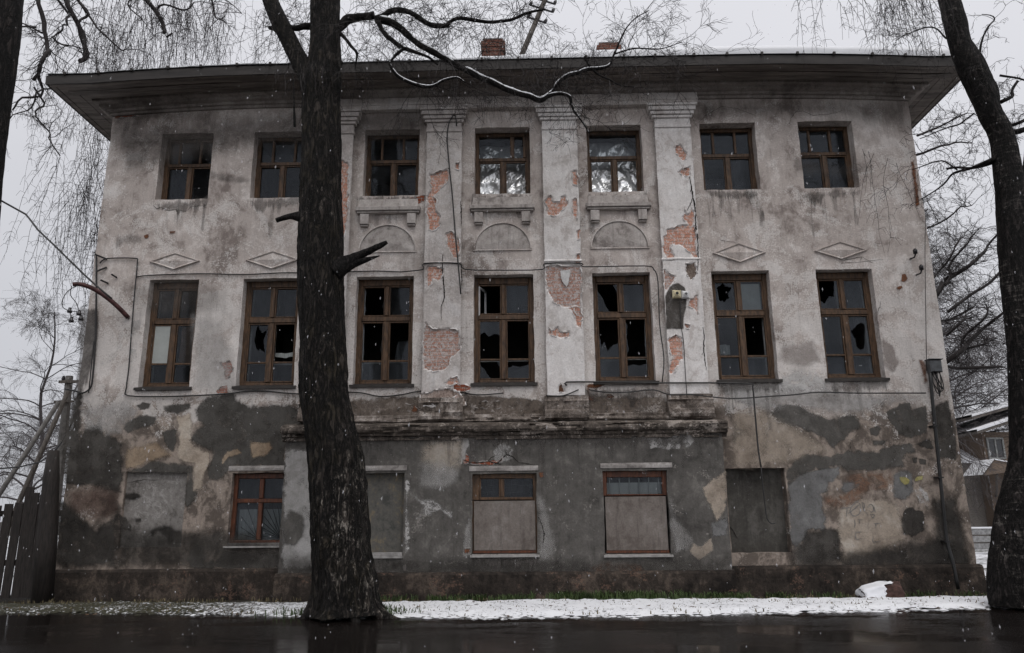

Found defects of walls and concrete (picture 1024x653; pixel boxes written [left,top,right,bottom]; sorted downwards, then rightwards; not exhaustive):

flaking render [674,144,691,178]
flaking render [410,161,460,257]
flaking render [544,171,583,338]
flaking render [662,208,698,290]
flaking render [216,360,234,394]
flaking render [397,324,471,412]
flaking render [668,296,700,373]
damp [72,490,305,565]
damp [793,497,969,565]